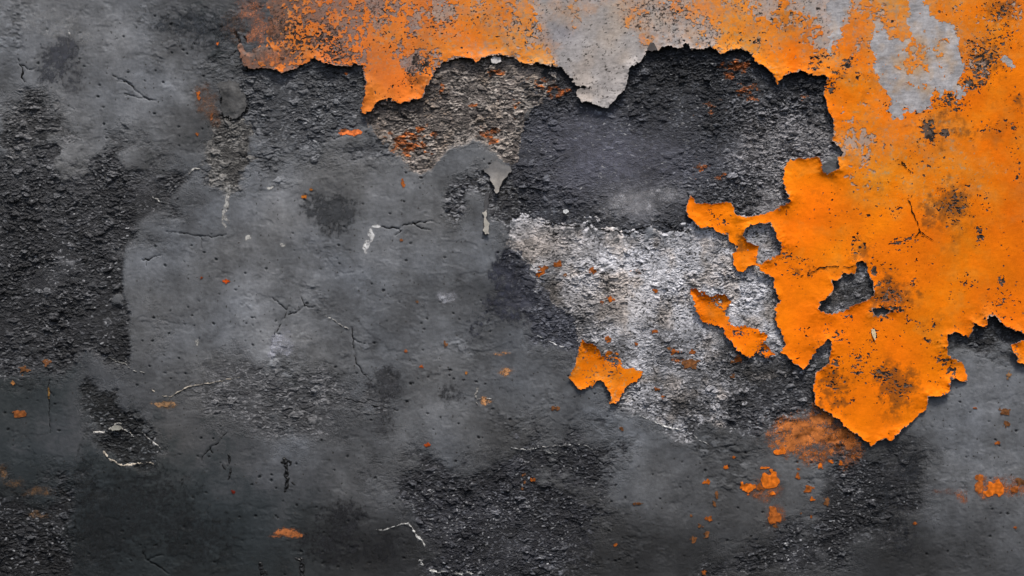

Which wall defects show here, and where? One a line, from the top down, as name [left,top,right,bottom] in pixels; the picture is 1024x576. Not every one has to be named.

flaking render [947,316,1024,373]
flaking render [688,429,948,576]
peeling [974,474,984,494]